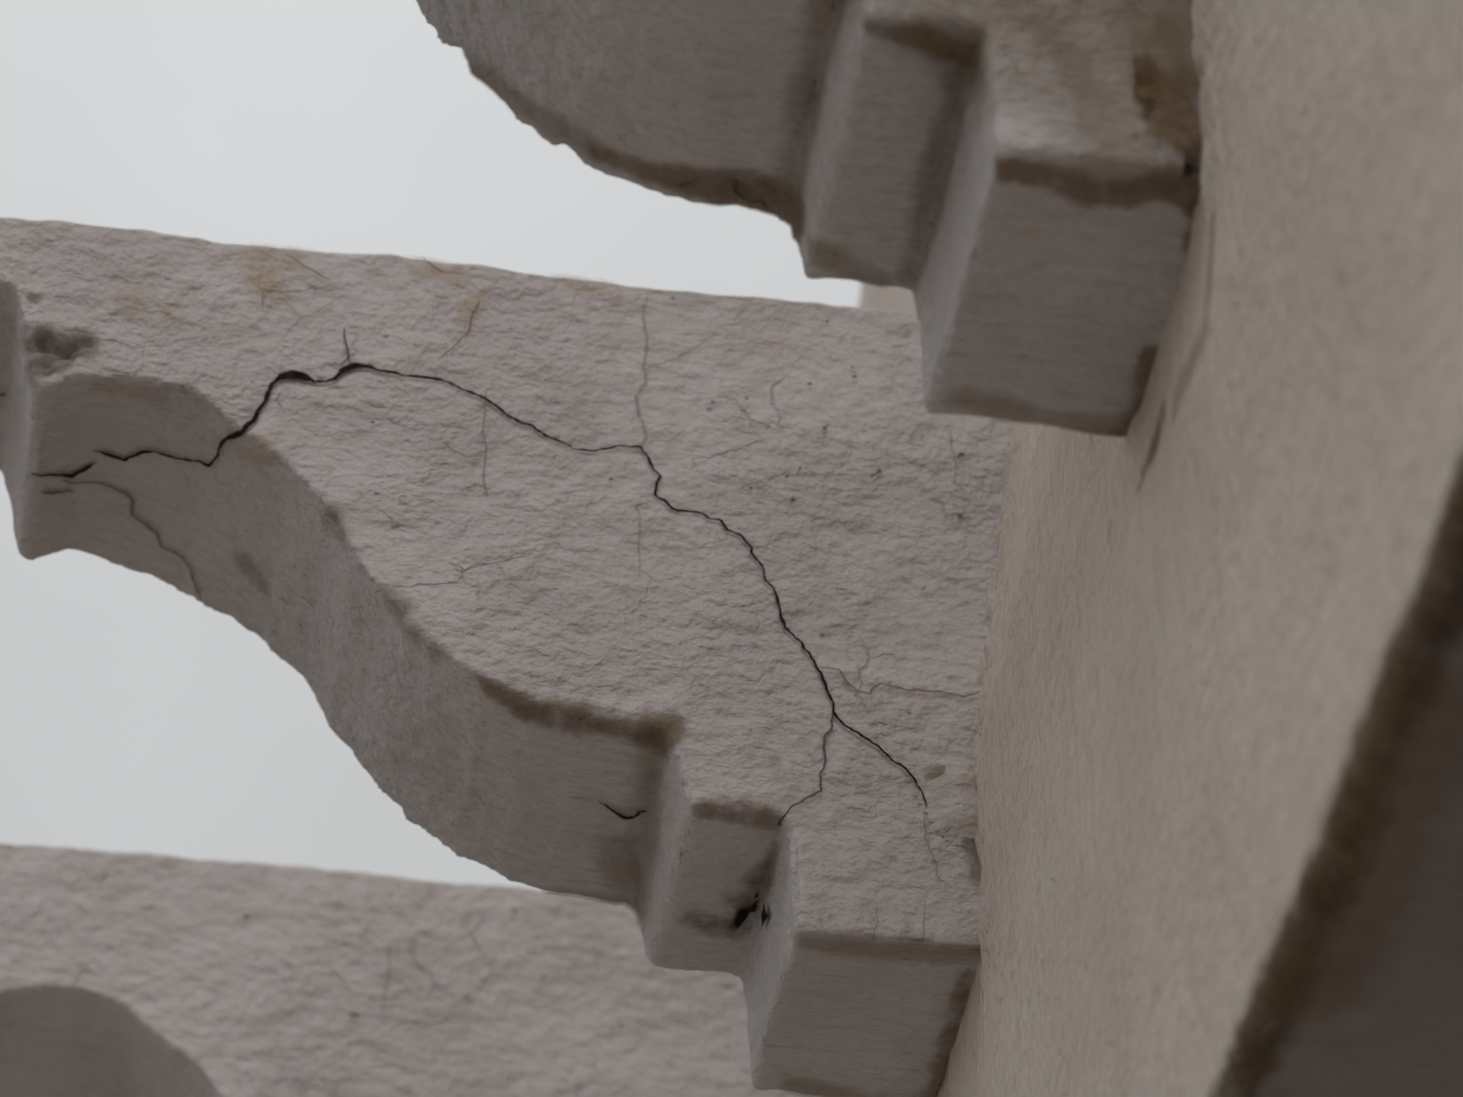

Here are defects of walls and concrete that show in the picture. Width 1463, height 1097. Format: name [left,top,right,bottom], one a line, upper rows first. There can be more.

water stain [996,160,1201,244]
water stain [1130,350,1157,415]
crack [31,254,979,826]
water stain [481,681,676,752]